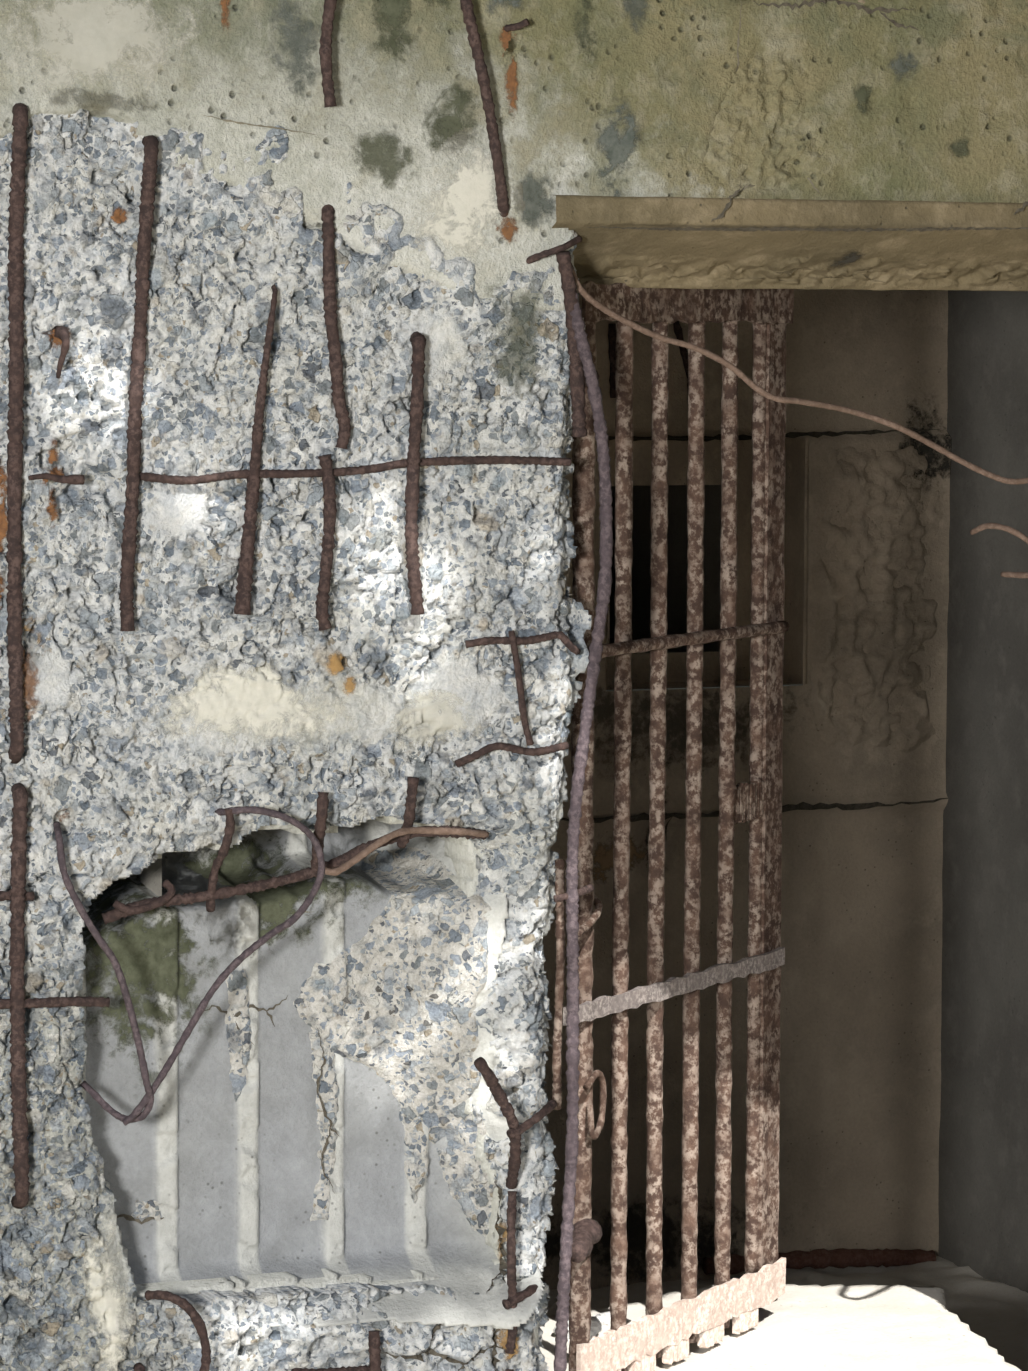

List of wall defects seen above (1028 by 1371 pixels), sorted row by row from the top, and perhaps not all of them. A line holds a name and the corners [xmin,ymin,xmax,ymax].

corrosion [220,0,230,29]
corrosion [500,28,518,112]
corrosion [110,208,127,224]
corrosion [496,217,518,242]
corrosion [0,462,8,554]
corrosion [42,440,64,521]
corrosion [22,627,39,719]
corrosion [327,653,356,694]
spalling [0,103,613,1371]
damp [79,877,214,1055]